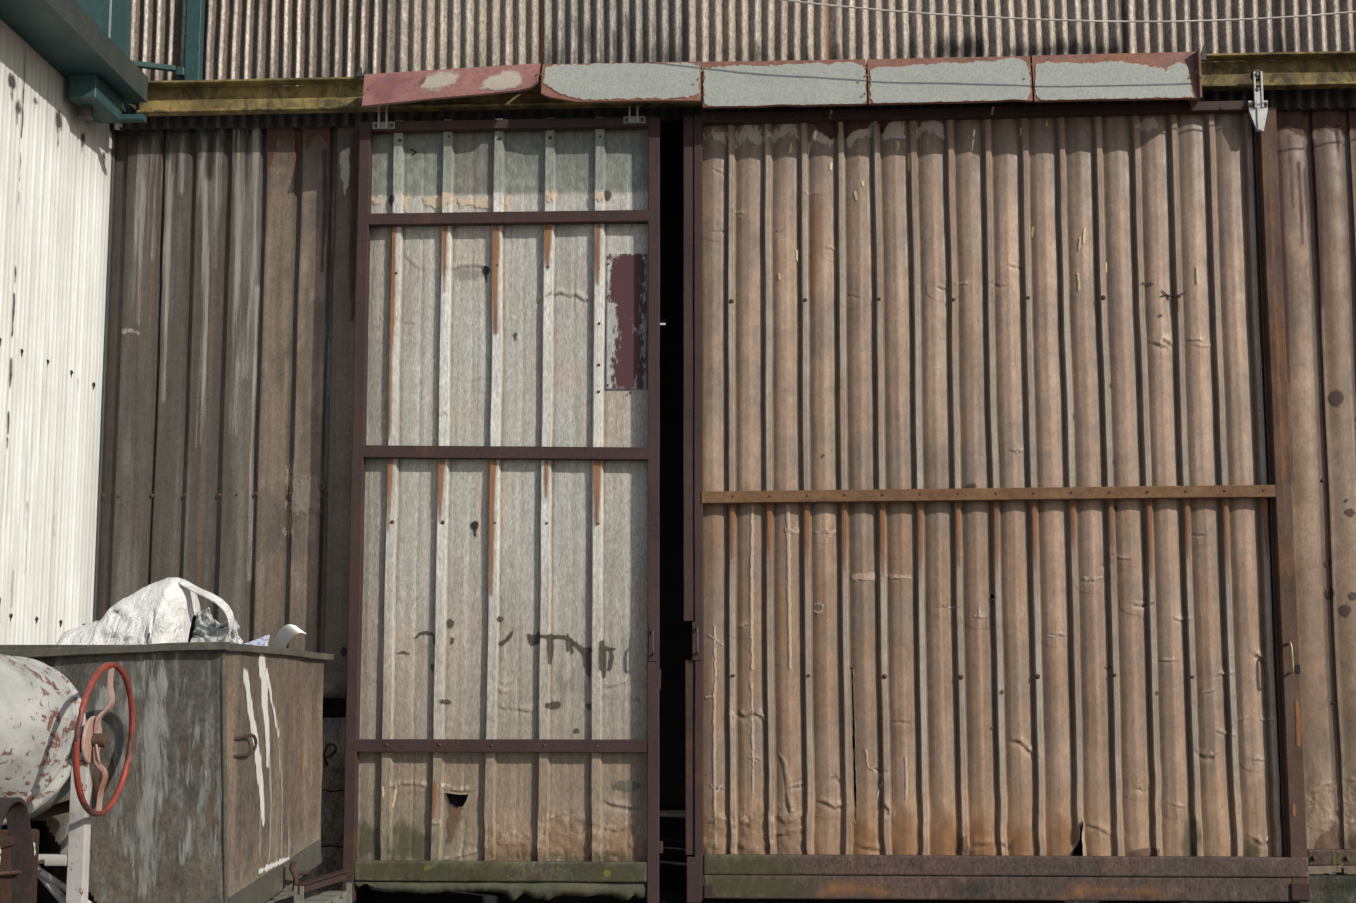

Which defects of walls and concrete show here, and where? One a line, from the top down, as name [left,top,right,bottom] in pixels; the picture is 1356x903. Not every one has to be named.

peeling [479,70,522,90]
peeling [543,57,1194,106]
leakage [339,148,350,195]
leakage [134,134,184,391]
corrosion [492,225,500,334]
corrosion [544,224,552,269]
leakage [200,128,259,533]
leakage [441,783,463,843]